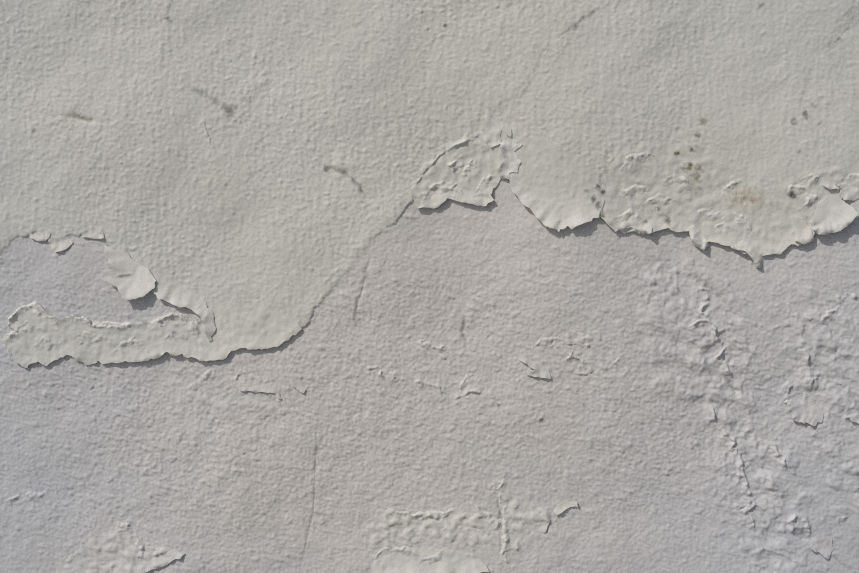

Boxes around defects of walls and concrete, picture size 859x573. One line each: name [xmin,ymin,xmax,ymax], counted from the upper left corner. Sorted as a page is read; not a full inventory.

peeling [406,110,859,268]
peeling [1,228,302,368]
peeling [365,476,578,573]